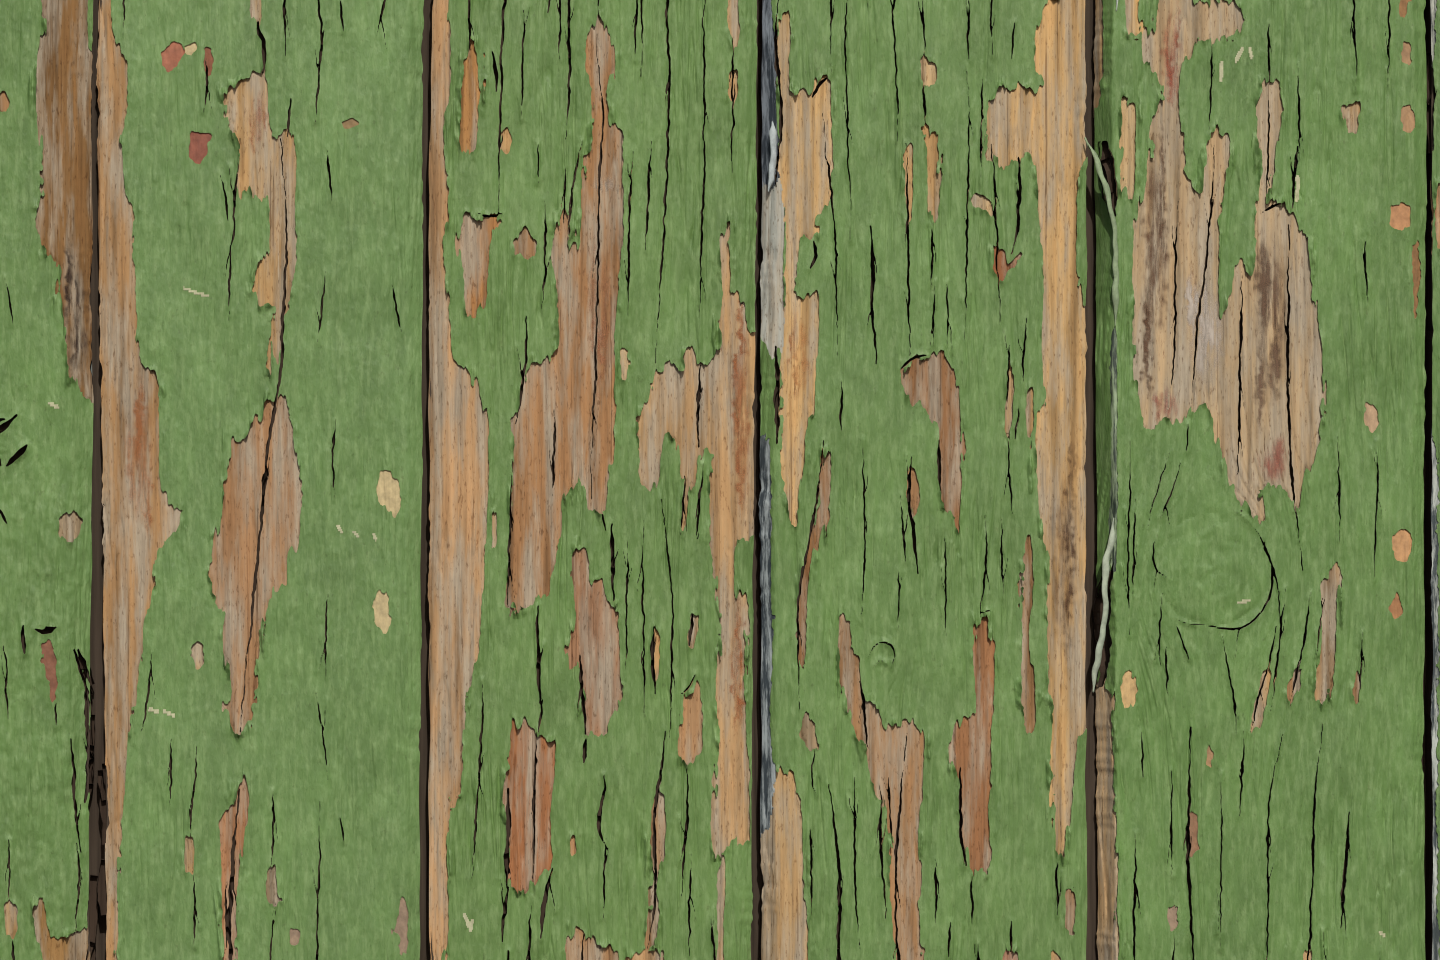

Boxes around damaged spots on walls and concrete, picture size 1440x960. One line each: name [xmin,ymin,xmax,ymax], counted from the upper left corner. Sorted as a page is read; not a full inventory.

peeling [249,0,262,28]
peeling [0,91,10,112]
peeling [161,41,304,745]
peeling [4,0,187,960]
peeling [377,470,401,518]
peeling [428,0,839,960]
peeling [830,0,1327,960]
peeling [372,590,392,634]
peeling [184,829,194,881]
peeling [211,768,257,960]
peeling [266,864,282,907]
peeling [391,896,409,955]